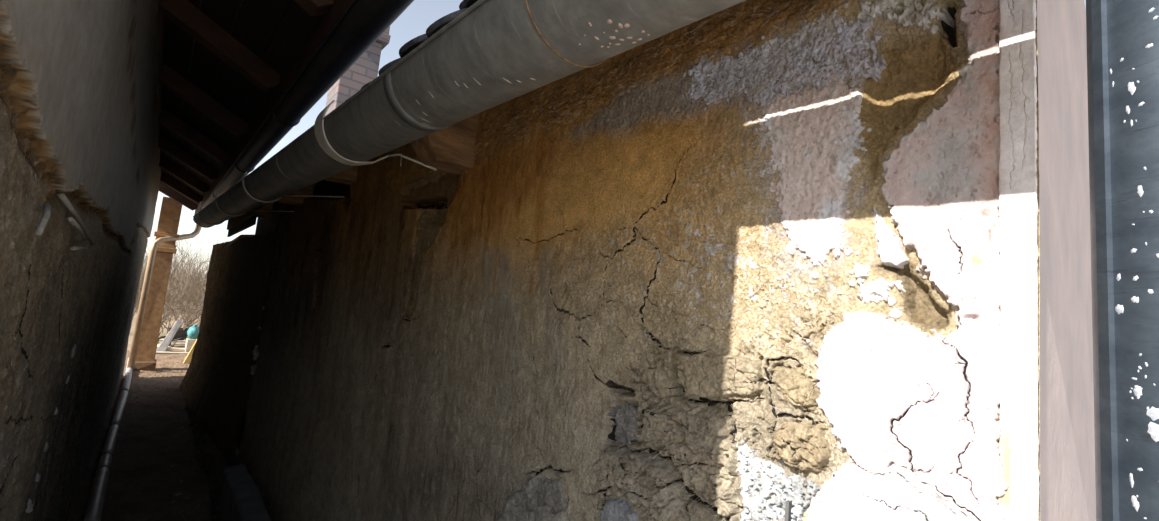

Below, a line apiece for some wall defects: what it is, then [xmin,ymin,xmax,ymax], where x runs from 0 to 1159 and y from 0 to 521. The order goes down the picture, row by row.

peeling [0,0,161,253]
crack [15,265,33,378]
crack [527,146,826,521]
peeling [680,0,1009,521]
crack [864,337,981,521]